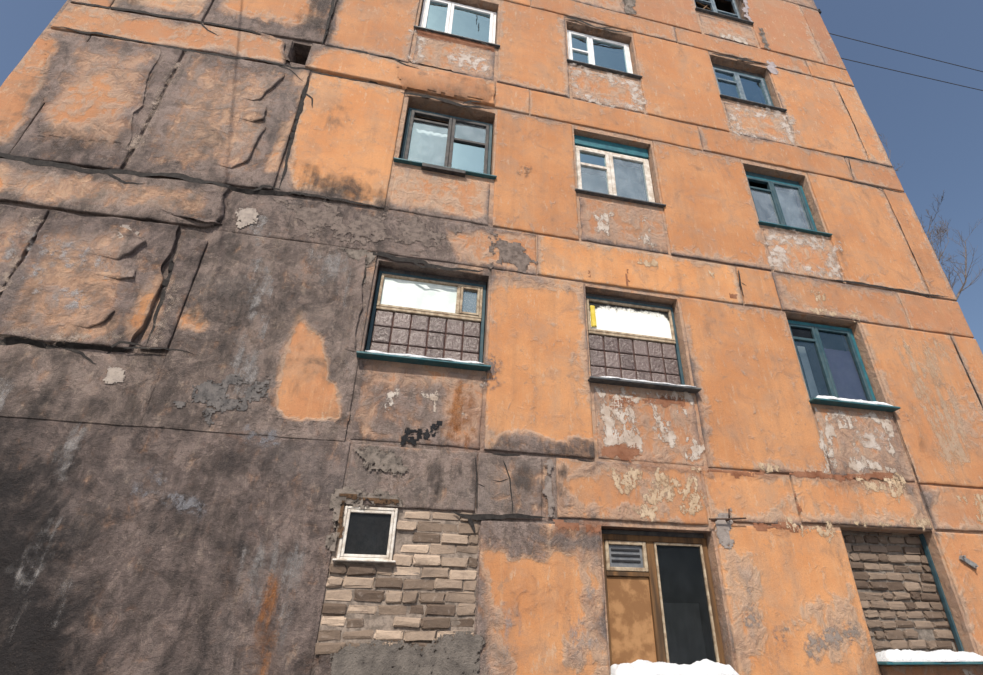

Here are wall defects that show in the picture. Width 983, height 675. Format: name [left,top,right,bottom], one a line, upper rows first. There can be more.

crack [0,0,489,208]
spalling [273,197,462,284]
spalling [487,232,538,273]
crack [452,453,546,533]
peeling [595,385,706,522]
peeling [856,472,906,504]